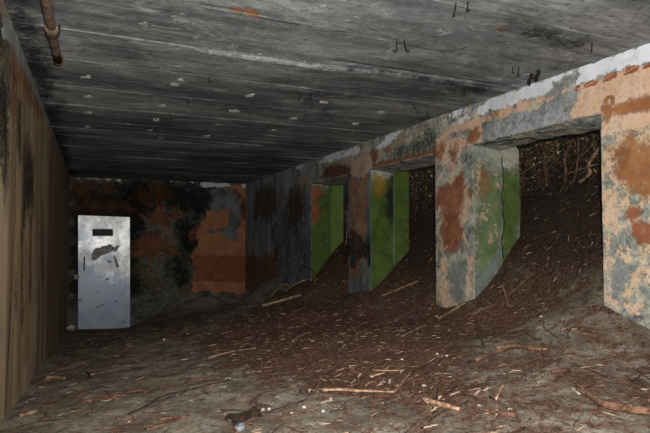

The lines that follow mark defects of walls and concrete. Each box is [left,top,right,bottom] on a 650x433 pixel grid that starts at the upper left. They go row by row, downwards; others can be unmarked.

leakage [0,16,39,381]
leakage [7,0,80,286]
leakage [68,180,242,305]
peeling [130,204,184,264]
peeling [188,182,246,295]
rust [435,170,489,254]
crack [483,128,568,260]
peeling [434,43,650,318]
rust [609,134,650,200]
rust [626,206,650,245]